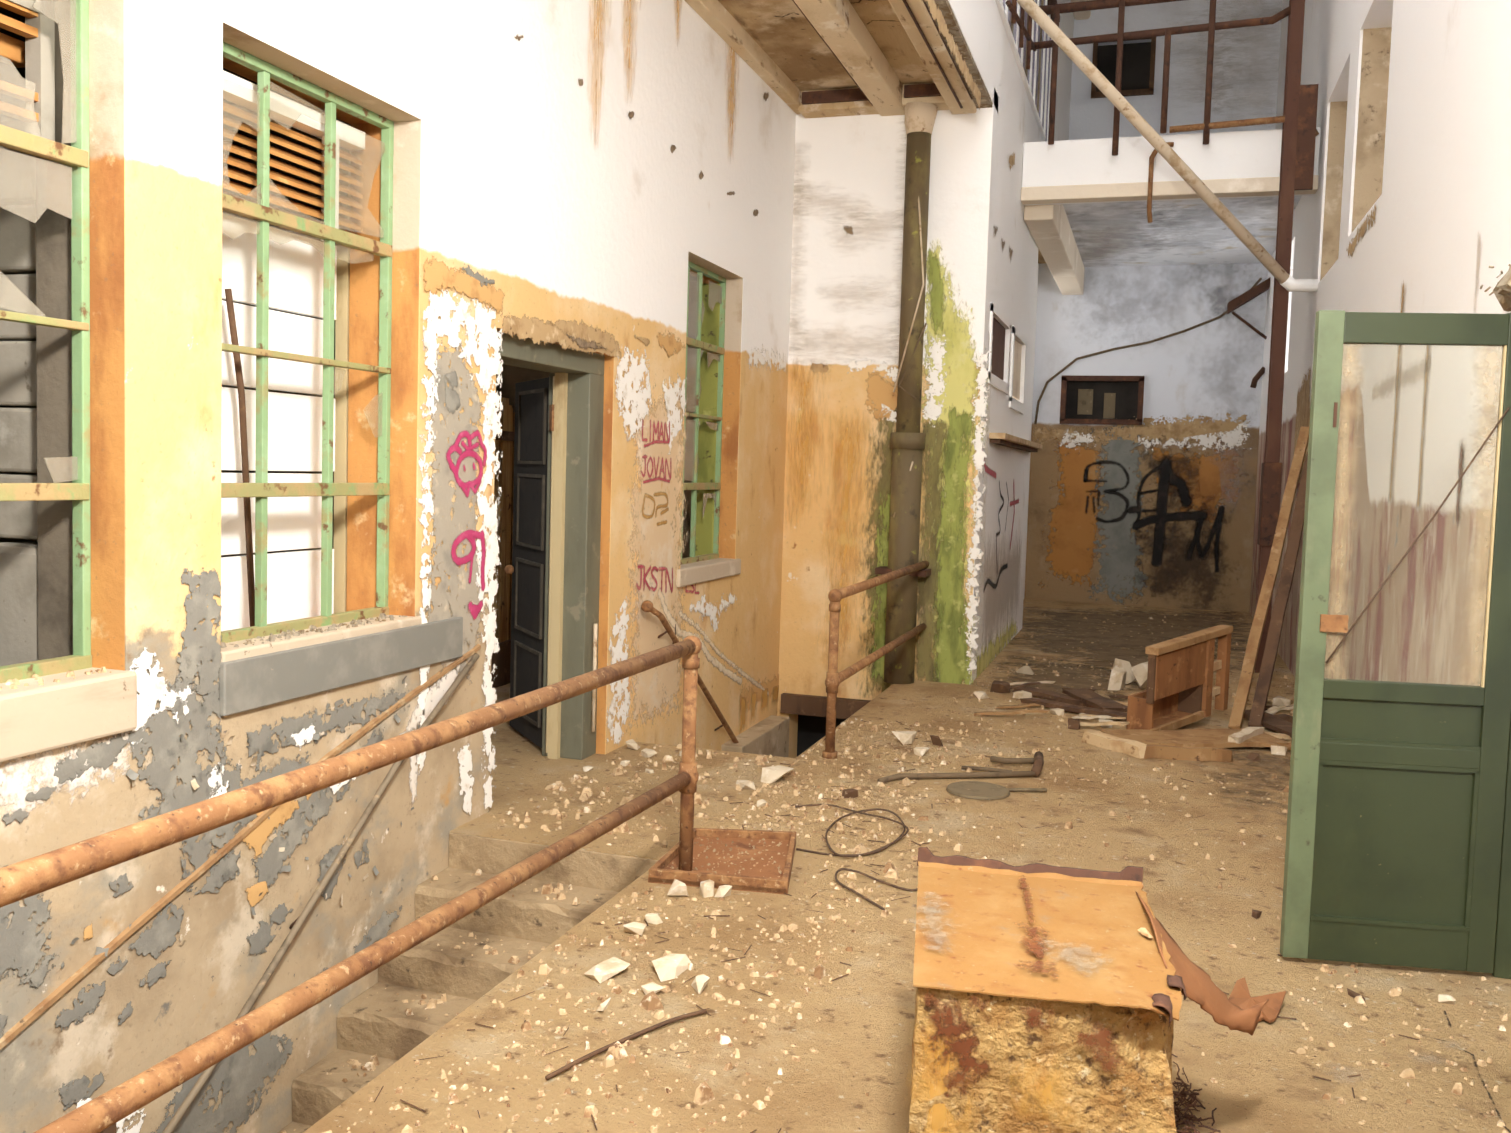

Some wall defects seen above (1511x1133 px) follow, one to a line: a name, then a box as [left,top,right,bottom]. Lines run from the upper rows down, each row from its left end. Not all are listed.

peeling [748,344,787,373]
leakage [915,246,1251,702]
peeling [2,256,687,825]
leakage [863,408,897,697]
spalling [689,593,737,632]
leakage [1216,747,1291,804]
peeling [0,893,65,989]
peeling [55,772,379,1031]
peeling [354,906,402,954]
peeling [0,1014,8,1039]
peeling [55,1073,105,1111]
peeling [116,1031,297,1133]